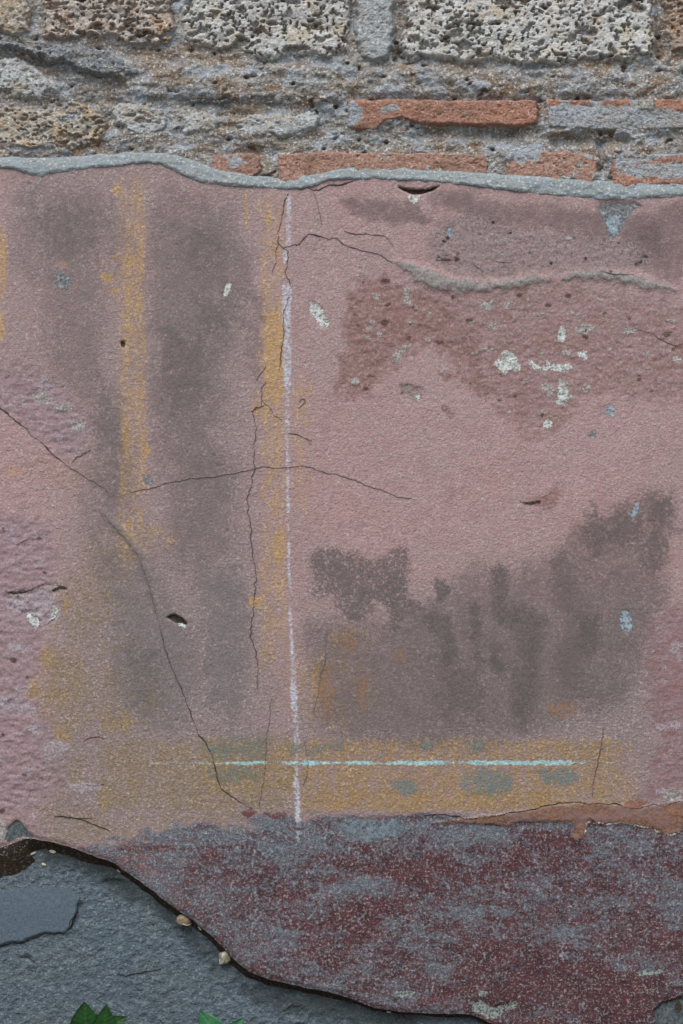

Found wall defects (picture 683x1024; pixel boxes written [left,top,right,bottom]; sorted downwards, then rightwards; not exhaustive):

crack [0,408,108,492]
crack [107,181,405,809]
spalling [0,514,517,1024]
peeling [438,802,683,841]